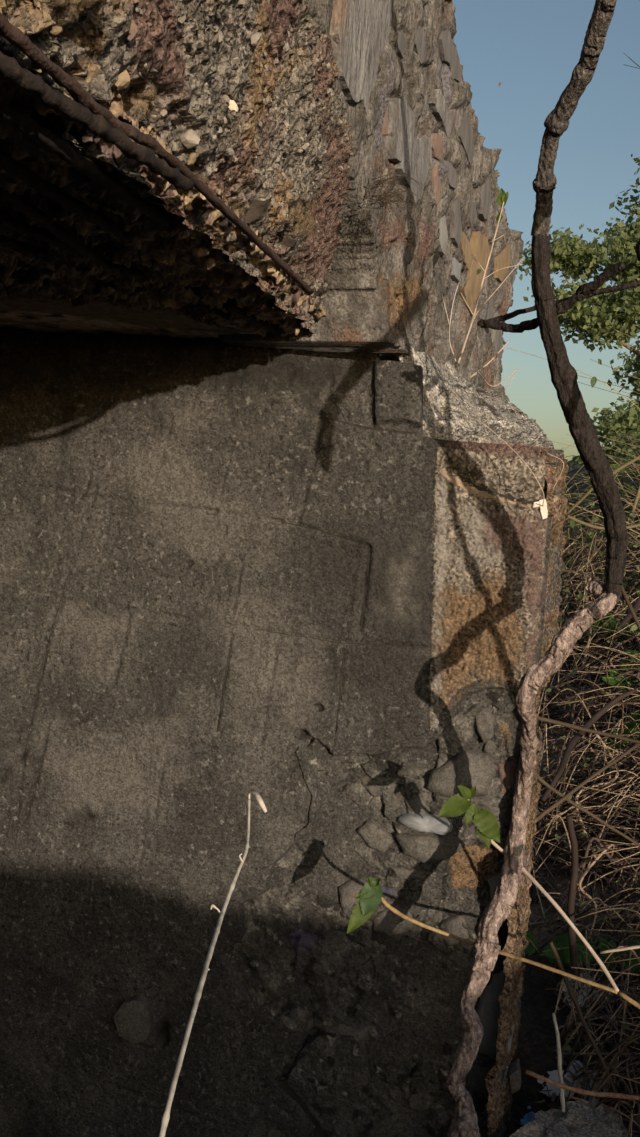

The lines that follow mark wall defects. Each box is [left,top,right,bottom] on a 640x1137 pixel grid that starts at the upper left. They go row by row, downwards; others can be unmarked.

spalling [0,0,354,339]
rust [285,113,350,285]
flaking render [225,680,521,1137]